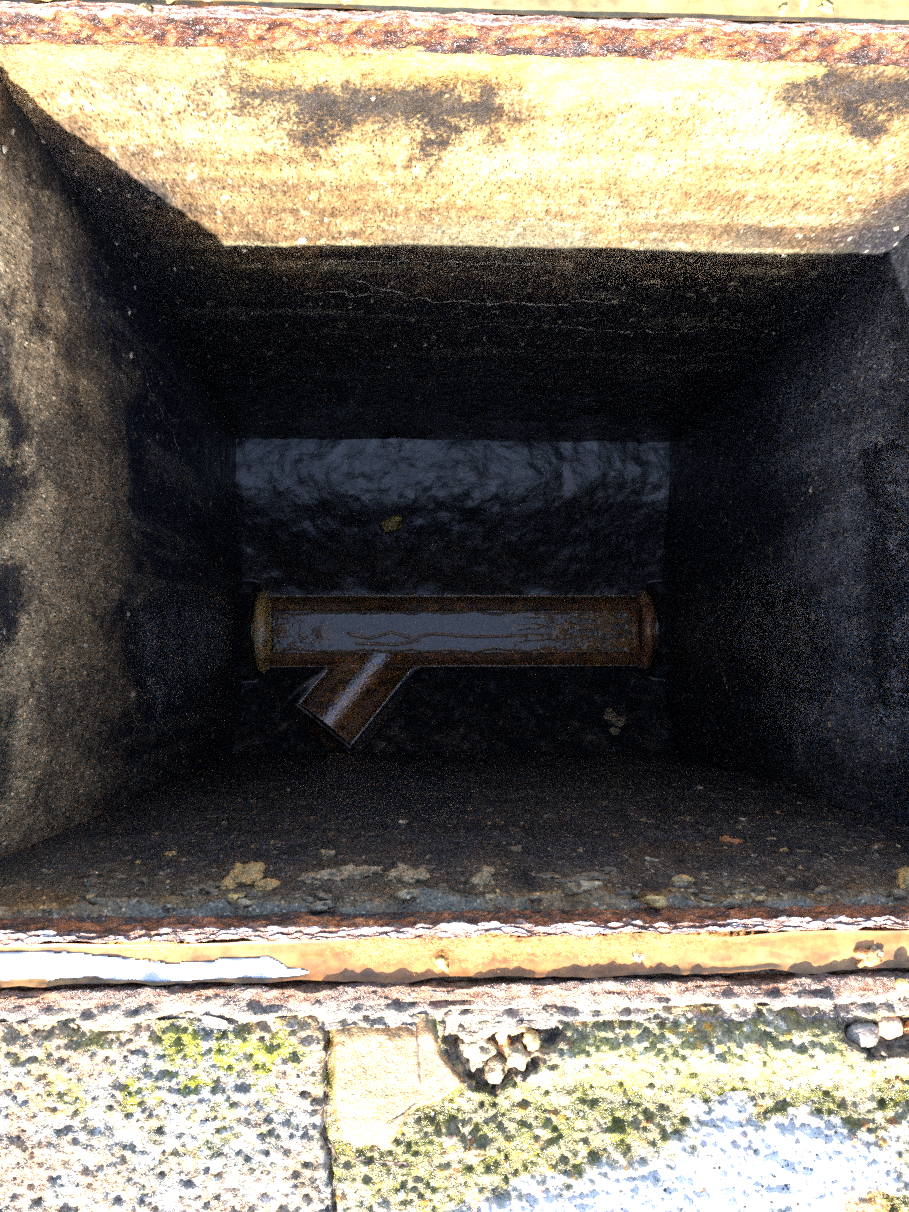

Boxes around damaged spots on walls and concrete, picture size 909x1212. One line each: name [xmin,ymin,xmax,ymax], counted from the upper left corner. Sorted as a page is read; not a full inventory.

damp [191,50,542,179]
damp [762,42,909,147]
damp [0,75,130,291]
damp [0,377,39,535]
damp [0,562,23,673]
corrosion [110,935,191,960]
corrosion [329,931,748,967]